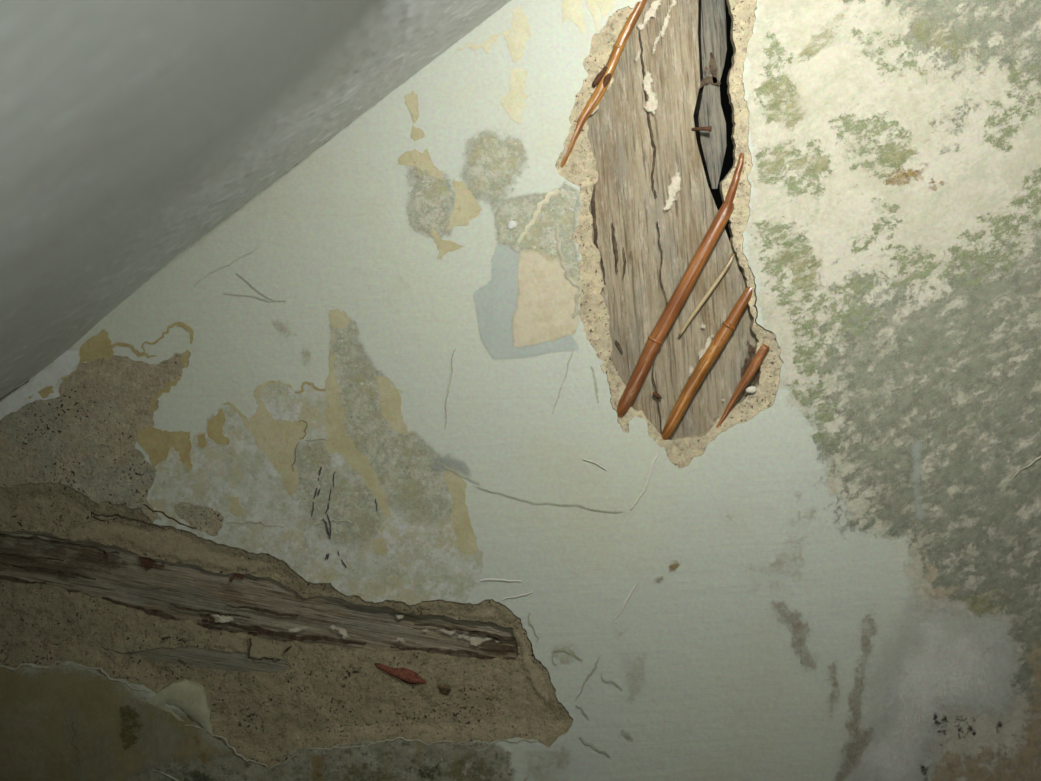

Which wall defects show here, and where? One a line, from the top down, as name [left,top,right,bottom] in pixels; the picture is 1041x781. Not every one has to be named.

water stain [754,0,1041,202]
spalling [0,306,573,768]
water stain [119,740,515,781]
peeling [397,0,1041,781]
water stain [746,165,1041,781]